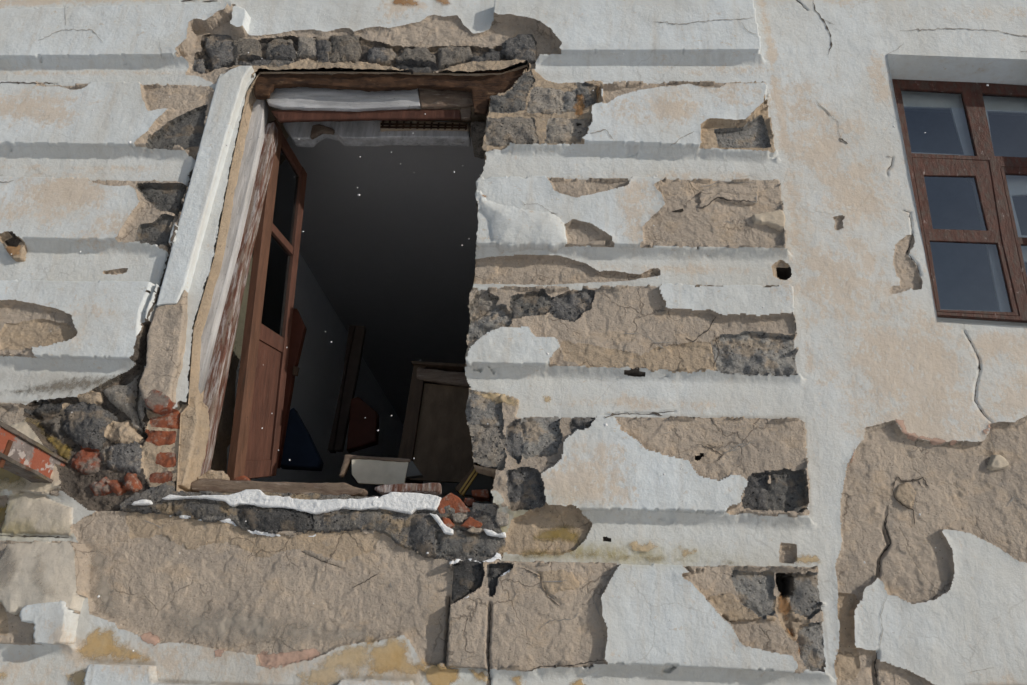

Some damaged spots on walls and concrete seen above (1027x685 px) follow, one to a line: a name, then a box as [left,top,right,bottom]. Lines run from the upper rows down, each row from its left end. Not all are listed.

crack [796,0,833,54]
spalling [134,2,776,161]
peeling [0,299,78,358]
spalling [87,178,190,252]
spalling [465,219,799,377]
peeling [640,177,787,249]
peeling [889,235,923,294]
crack [964,332,995,447]
spalling [615,416,810,518]
peeling [0,388,621,672]
peeling [682,415,1027,685]